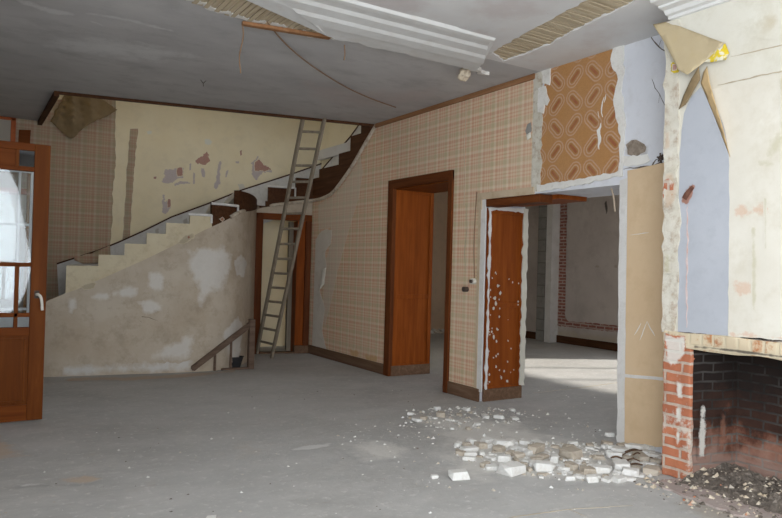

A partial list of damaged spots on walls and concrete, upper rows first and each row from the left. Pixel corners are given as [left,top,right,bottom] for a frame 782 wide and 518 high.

flaking render [186,0,319,38]
flaking render [494,0,633,60]
peeling [153,150,242,190]
peeling [250,155,273,181]
peeling [661,43,682,332]
peeling [65,268,169,316]
peeling [182,239,247,315]
peeling [312,229,332,349]
rust [680,183,696,328]